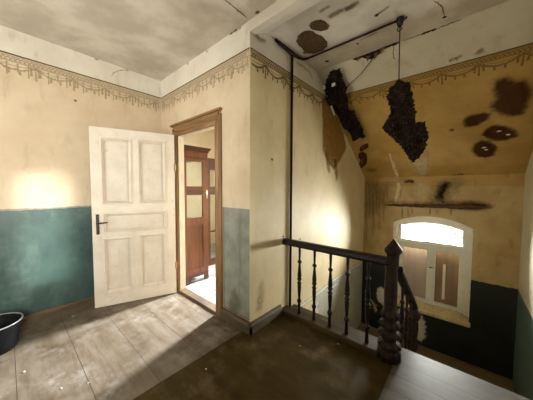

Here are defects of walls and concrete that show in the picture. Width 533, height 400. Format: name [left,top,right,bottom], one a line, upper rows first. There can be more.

peeling [296,20,329,54]
flaking render [353,42,399,62]
peeling [358,143,369,168]
peeling [370,287,384,312]
peeling [417,316,426,342]